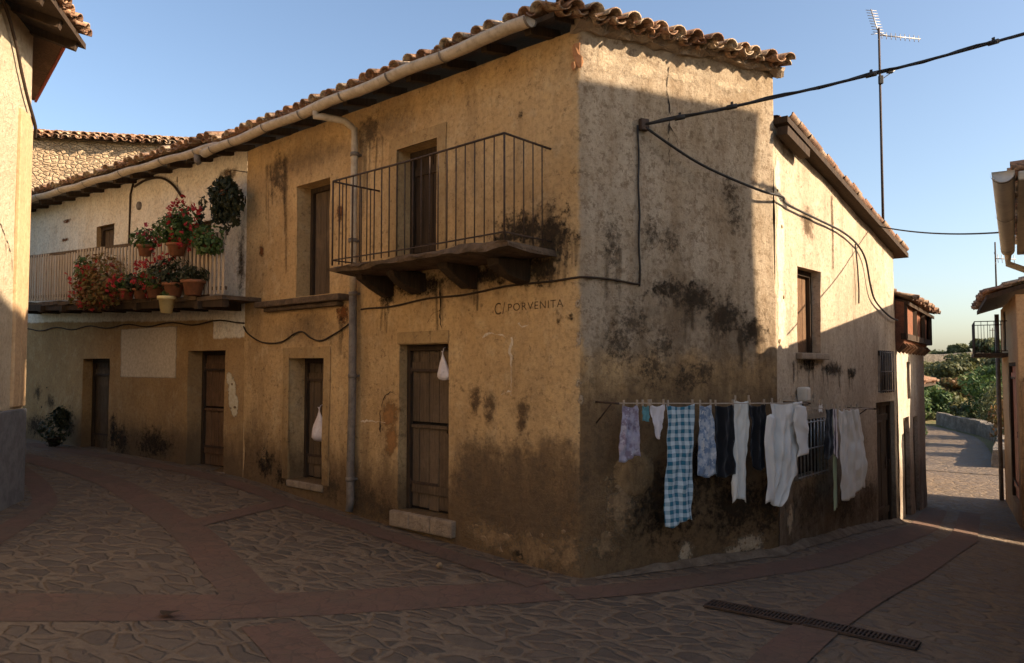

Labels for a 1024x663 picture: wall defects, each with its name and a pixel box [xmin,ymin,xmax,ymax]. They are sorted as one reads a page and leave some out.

crack [667,67,678,162]
leakage [495,206,580,287]
leakage [646,278,769,346]
peeling [226,372,238,417]
leakage [470,388,495,422]
leakage [517,402,530,432]